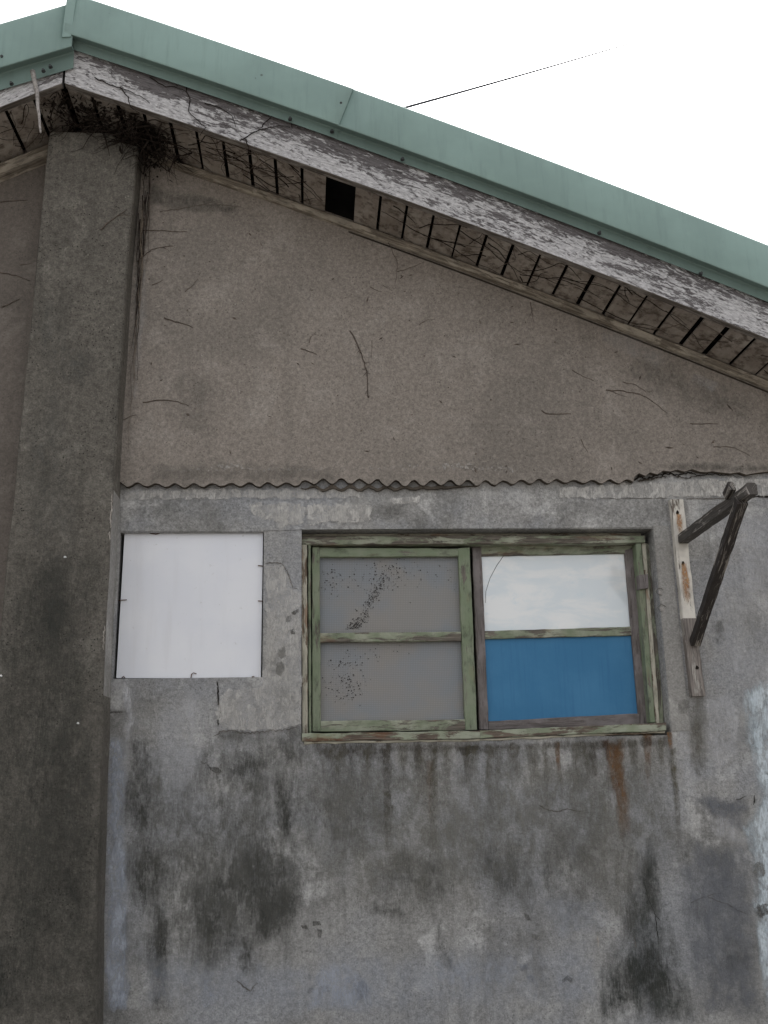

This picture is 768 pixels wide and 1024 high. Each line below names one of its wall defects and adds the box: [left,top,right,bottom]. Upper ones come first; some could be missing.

crack [215,682,223,725]
damp [105,688,301,1006]
damp [317,741,604,887]
rust [602,740,626,819]
damp [602,855,685,1017]